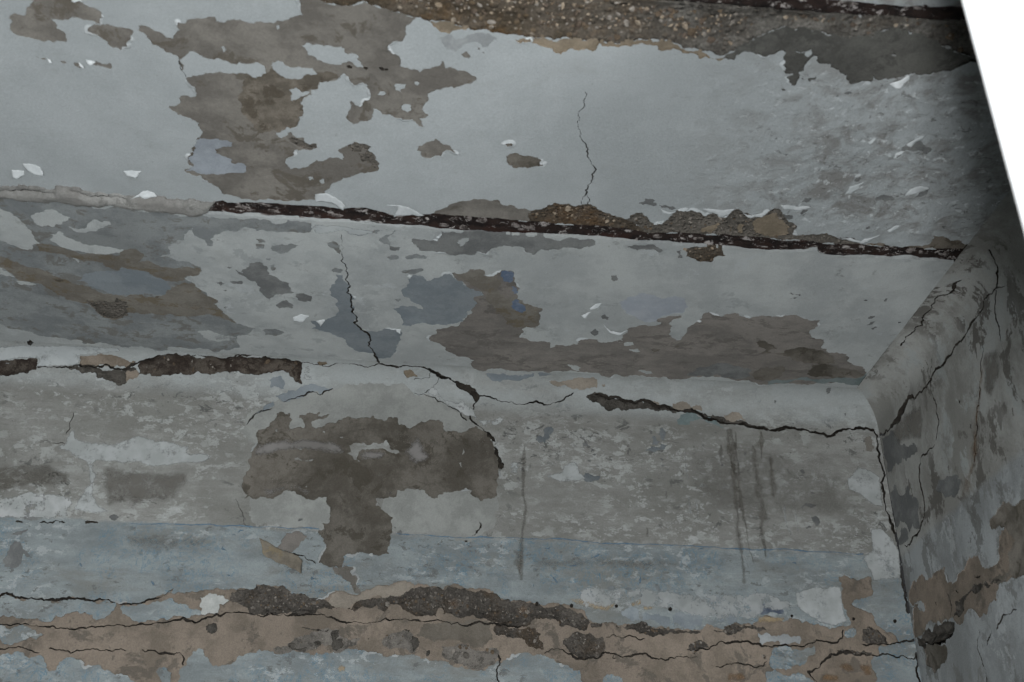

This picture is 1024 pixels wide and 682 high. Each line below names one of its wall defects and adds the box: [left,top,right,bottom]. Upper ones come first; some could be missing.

peeling [9,0,979,210]
crack [577,92,597,204]
flaking render [0,190,900,682]
crack [37,234,1004,613]
leakage [548,462,585,481]
crack [0,590,522,665]
crack [544,597,1016,682]
peeling [909,499,1024,673]